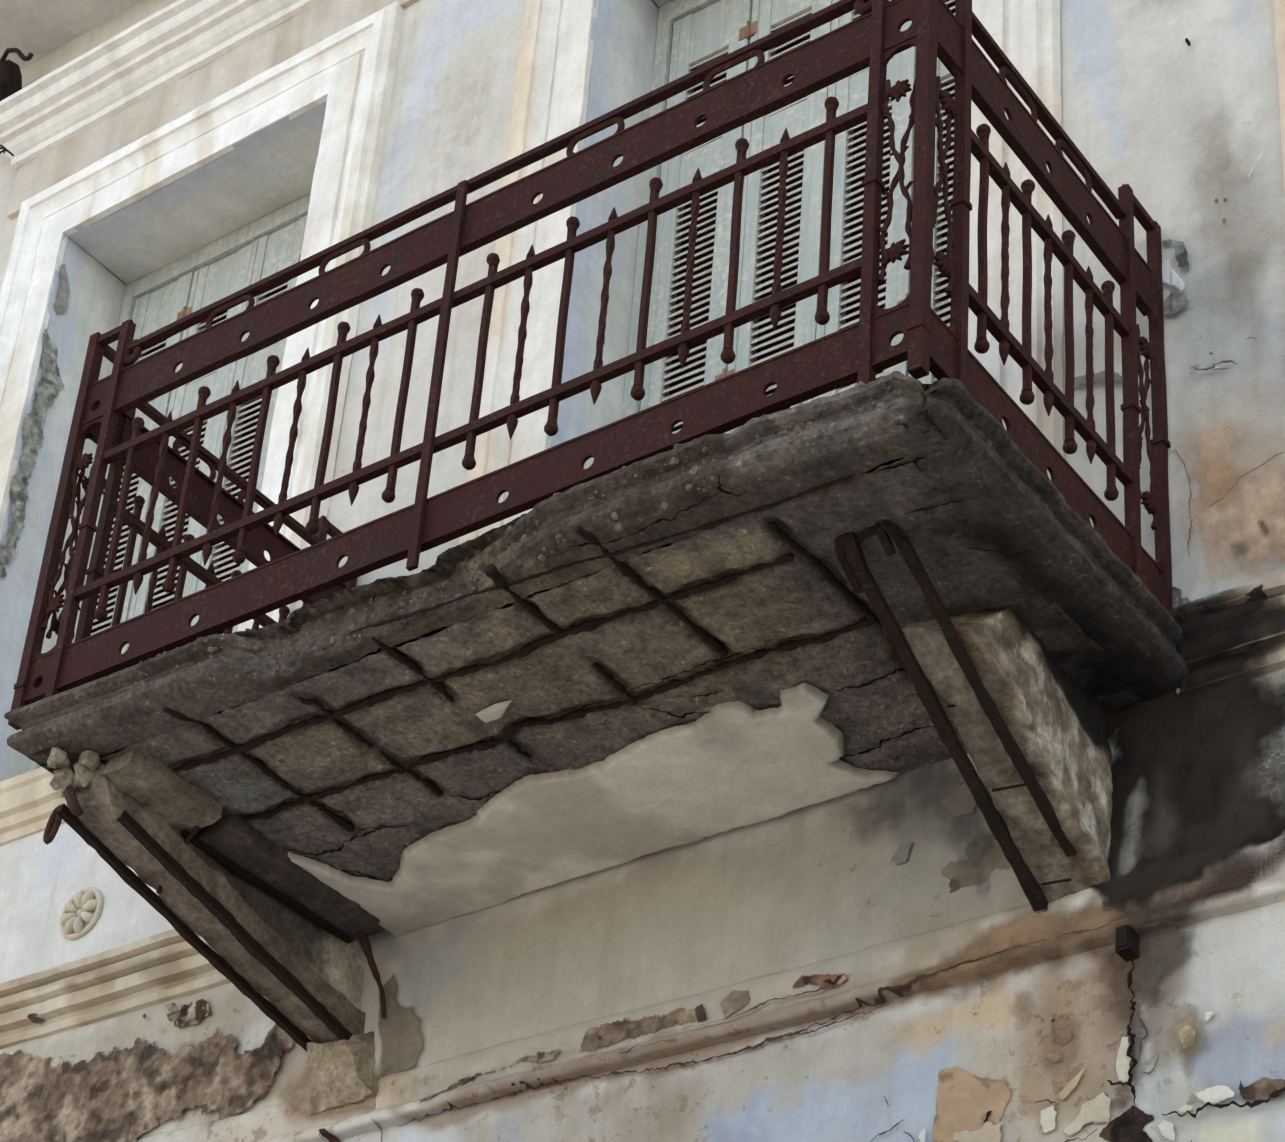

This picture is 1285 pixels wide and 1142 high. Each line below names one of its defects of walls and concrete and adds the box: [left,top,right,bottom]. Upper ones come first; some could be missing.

peeling [1162,239,1189,315]
crack [1175,449,1285,557]
spalling [47,444,1140,882]
water stain [1092,591,1285,920]
peeling [941,835,1011,893]
crack [1042,878,1071,886]
spalling [0,999,294,1142]
flaking render [579,1004,707,1052]
flaking render [918,1067,1011,1142]
peeling [1040,1068,1111,1136]
peeling [1116,1036,1131,1082]
crack [1106,956,1285,1142]